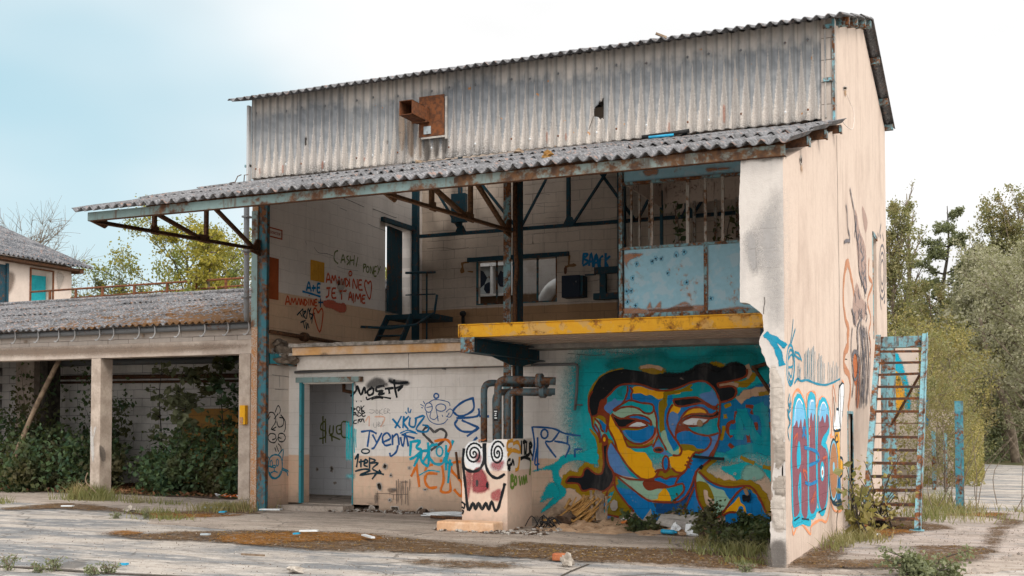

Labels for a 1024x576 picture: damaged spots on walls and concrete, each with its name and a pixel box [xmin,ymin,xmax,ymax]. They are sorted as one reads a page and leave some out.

rust [623,254,708,314]
spalling [769,365,786,533]